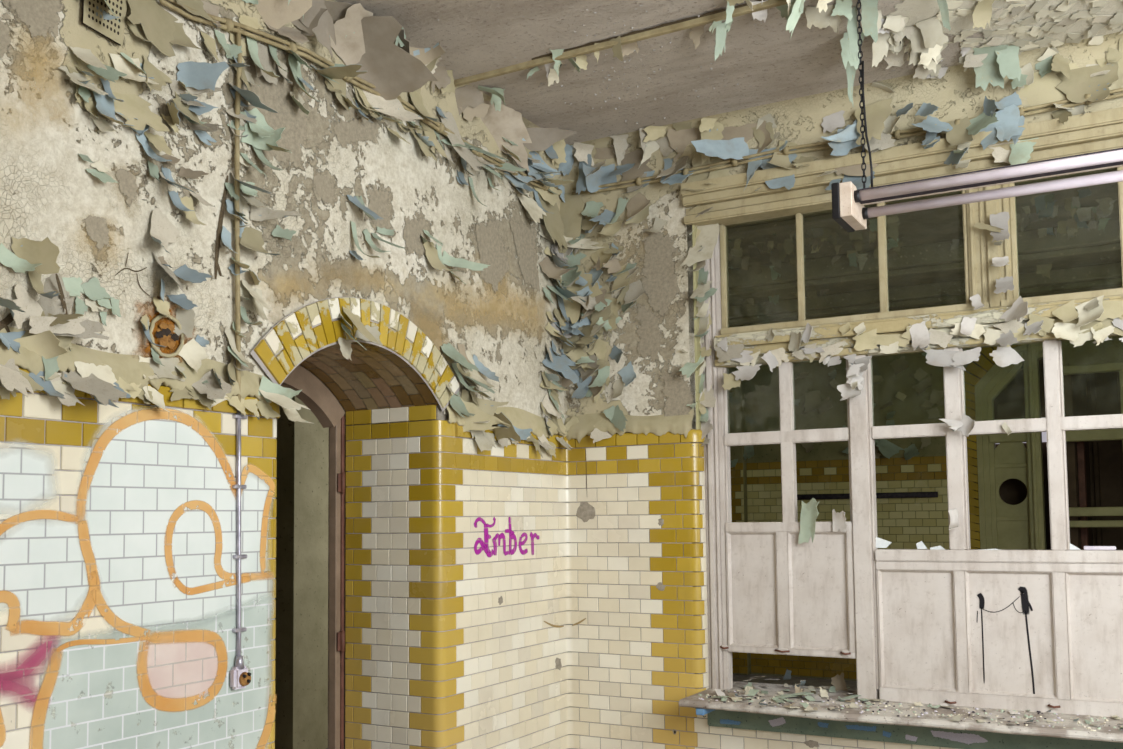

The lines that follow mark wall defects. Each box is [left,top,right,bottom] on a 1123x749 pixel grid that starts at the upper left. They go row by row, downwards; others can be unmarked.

peeling [0,0,1123,460]
corrosion [139,305,186,361]
peeling [730,445,754,468]
spalling [576,502,595,522]
peeling [798,498,847,544]
peeling [948,508,959,530]